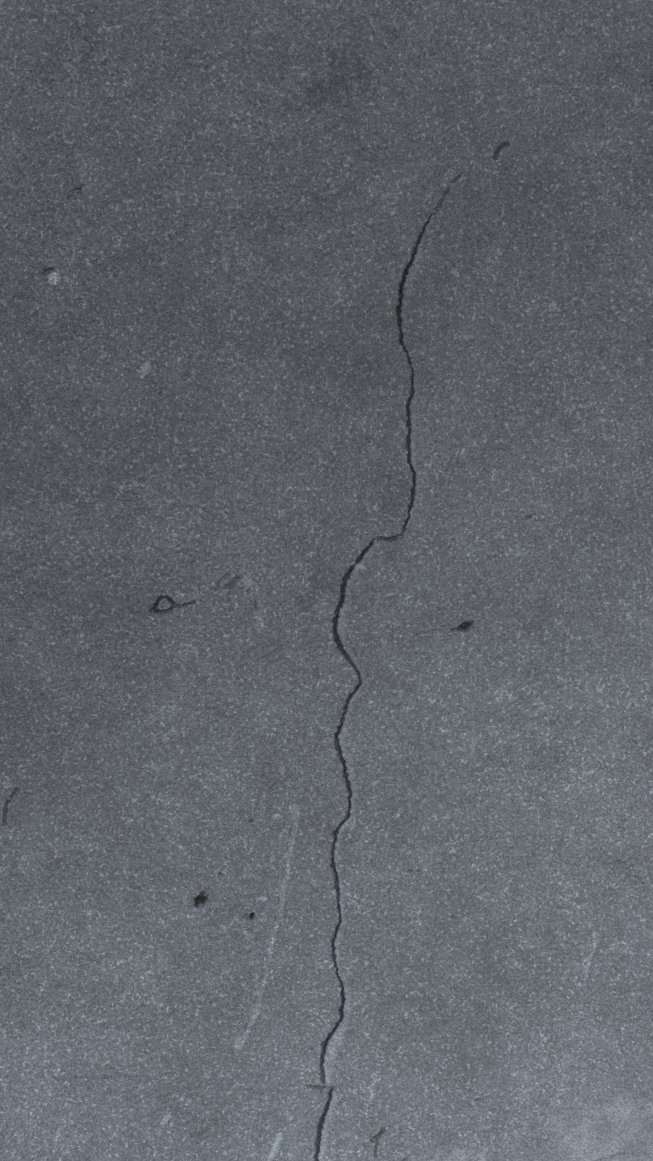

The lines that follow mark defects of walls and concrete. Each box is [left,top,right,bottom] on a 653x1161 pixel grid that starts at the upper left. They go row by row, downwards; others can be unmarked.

crack [492,141,511,160]
crack [306,171,463,1161]